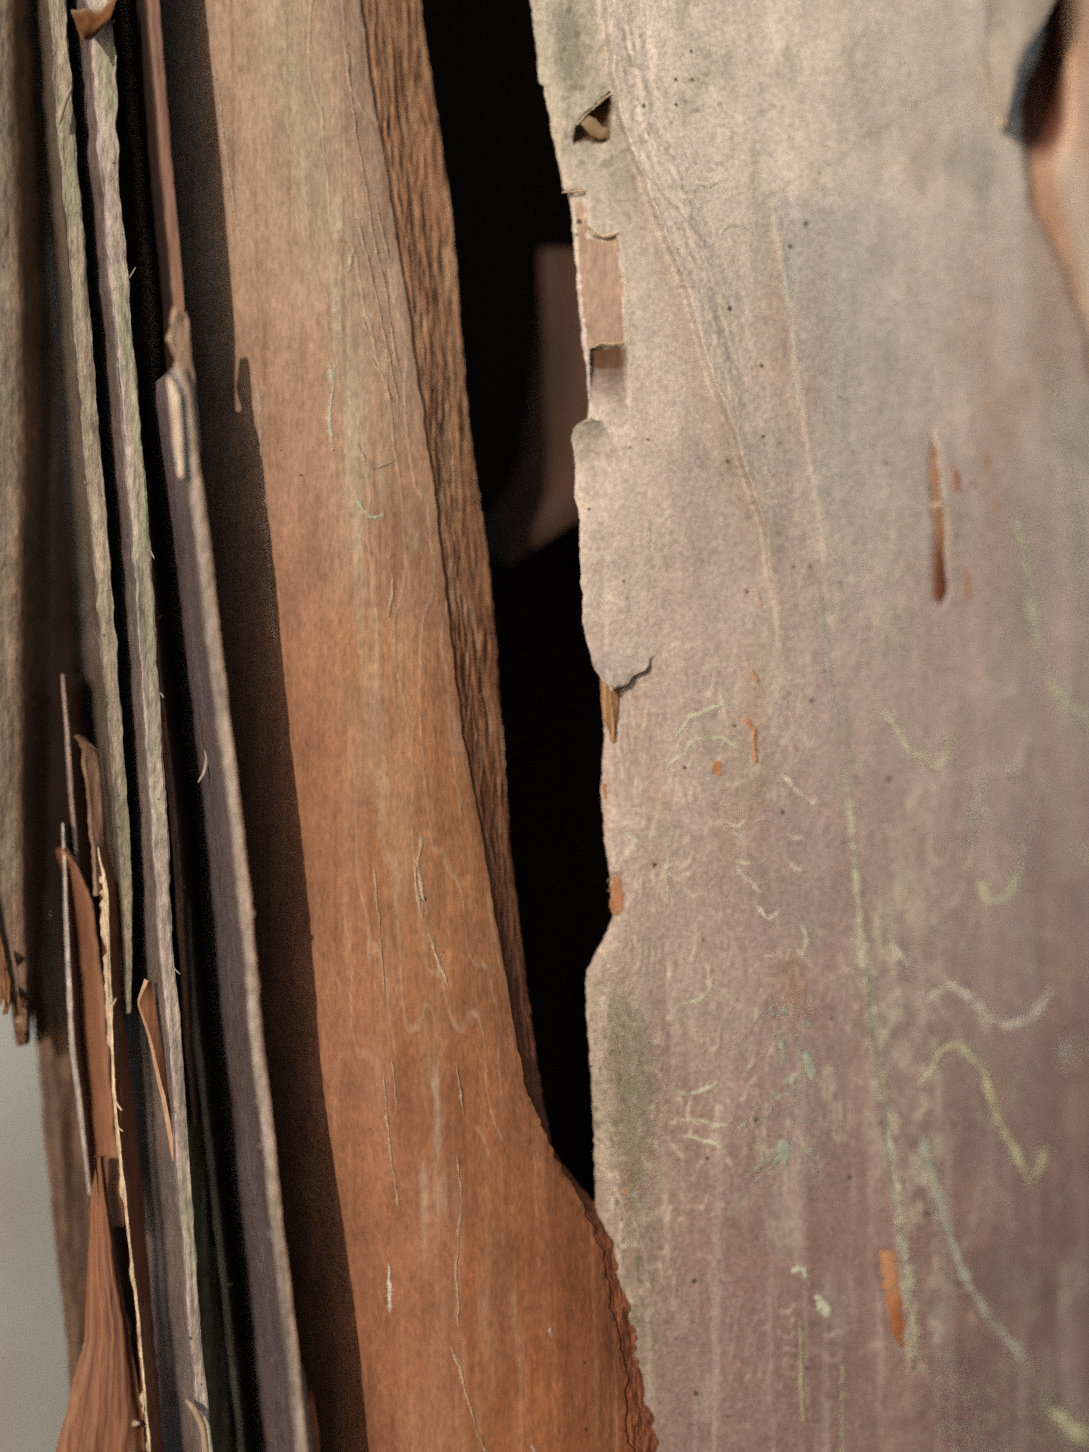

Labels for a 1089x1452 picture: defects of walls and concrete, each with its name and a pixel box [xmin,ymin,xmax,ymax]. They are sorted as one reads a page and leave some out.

peeling [571,418,685,691]